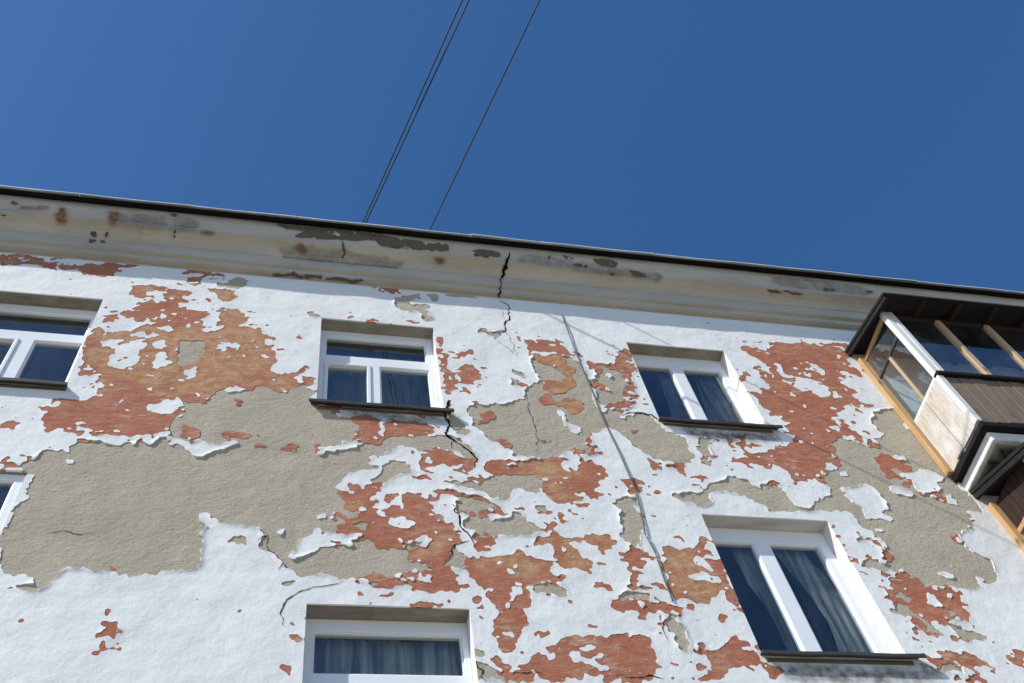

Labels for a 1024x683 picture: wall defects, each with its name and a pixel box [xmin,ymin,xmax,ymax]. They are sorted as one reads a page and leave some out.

peeling [0,254,140,280]
crack [481,252,517,357]
crack [443,400,478,467]
flaking render [0,270,1024,683]
crack [447,504,475,559]
crack [280,581,349,625]